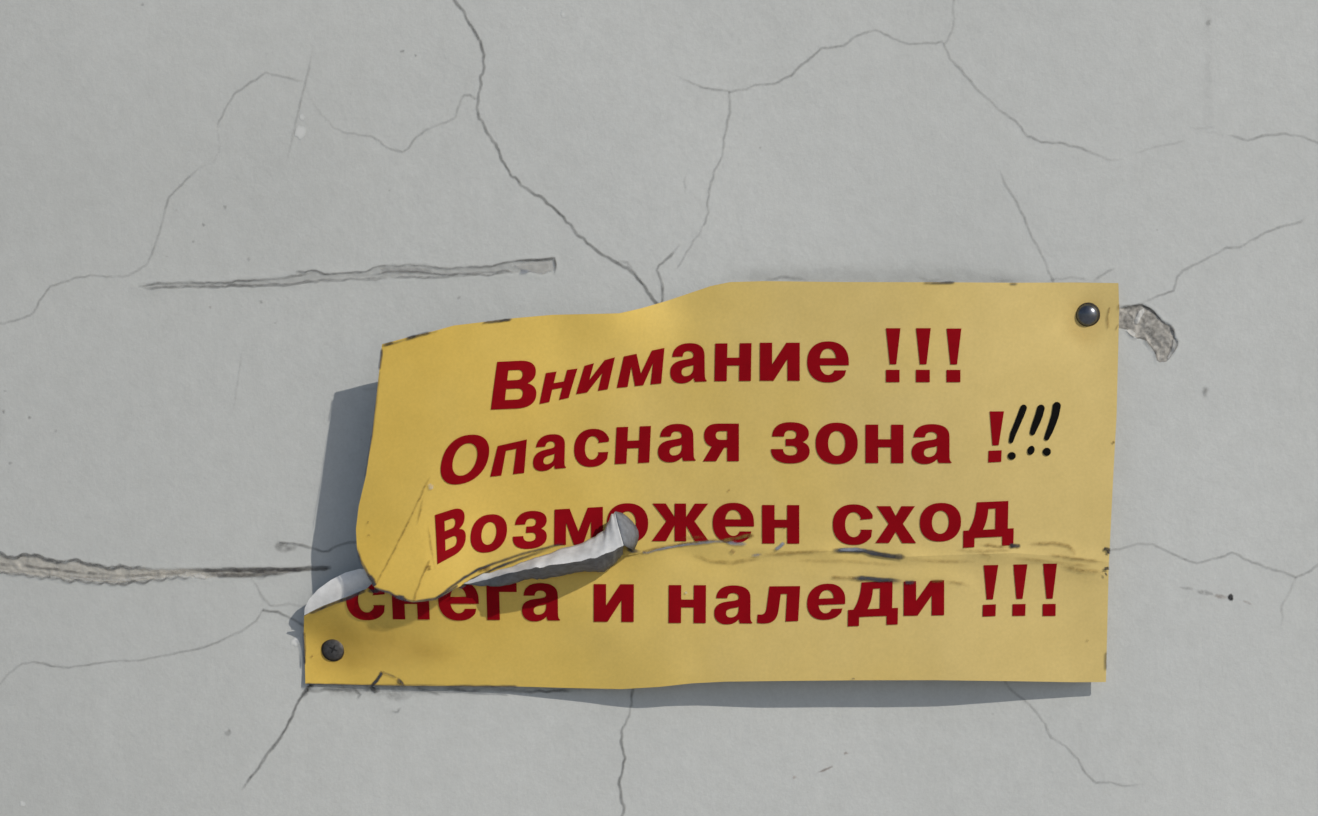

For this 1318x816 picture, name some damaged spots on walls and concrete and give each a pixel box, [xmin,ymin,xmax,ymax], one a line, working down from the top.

spalling [1119,304,1178,362]